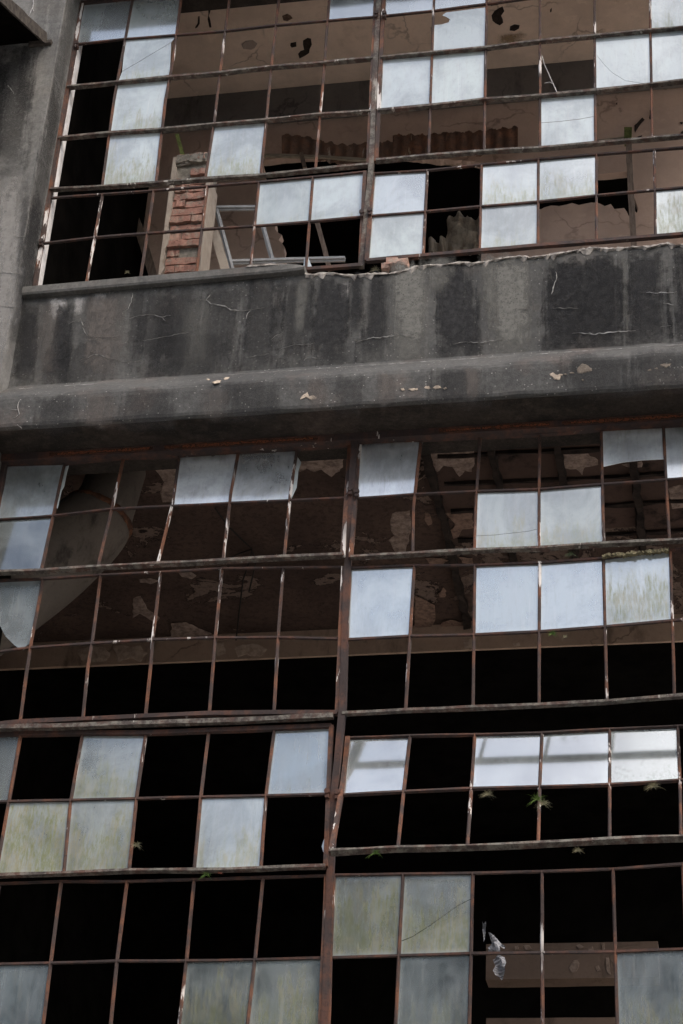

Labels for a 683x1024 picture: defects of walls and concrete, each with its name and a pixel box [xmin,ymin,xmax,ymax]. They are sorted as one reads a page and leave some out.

leakage [0,176,122,373]
crack [195,295,264,318]
leakage [282,249,683,361]
spalling [304,242,683,281]
crack [551,271,636,335]
spalling [550,363,592,381]